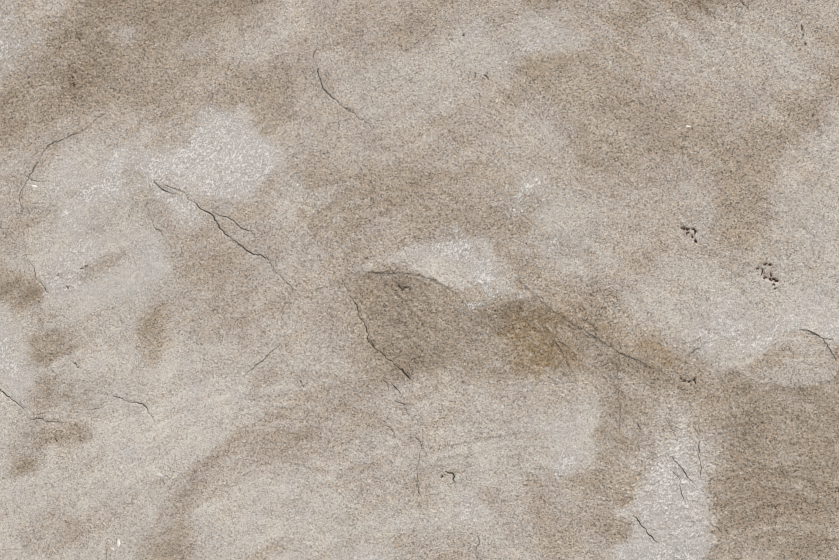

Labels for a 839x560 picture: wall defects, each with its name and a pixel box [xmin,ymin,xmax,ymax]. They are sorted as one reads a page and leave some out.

crack [313,35,373,130]
crack [157,184,437,415]
crack [0,389,63,423]